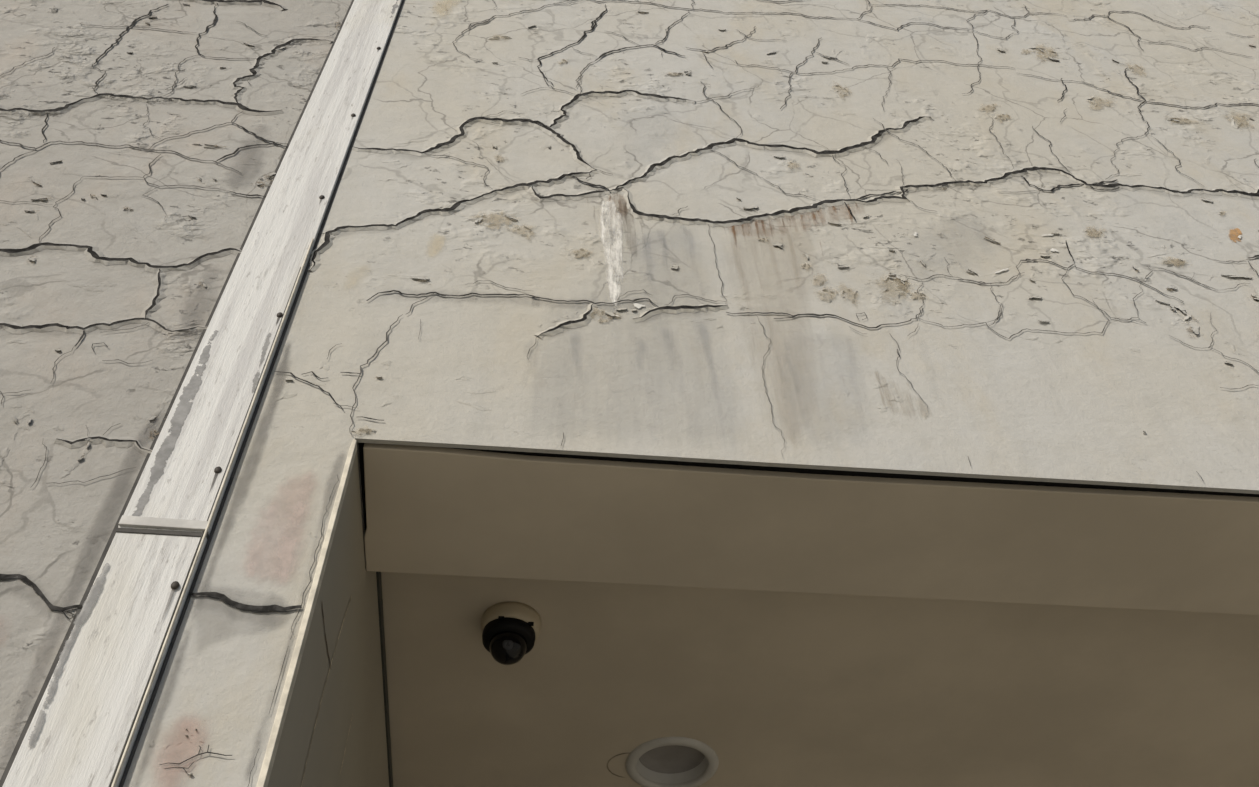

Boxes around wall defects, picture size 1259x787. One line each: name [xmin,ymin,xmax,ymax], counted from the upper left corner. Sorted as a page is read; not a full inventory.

crack [0,0,332,219]
crack [0,176,242,404]
water stain [600,200,623,306]
crack [274,0,1259,456]
peeling [758,225,954,319]
peeling [1155,287,1204,337]
crack [30,423,152,488]
crack [0,574,83,620]
crack [189,592,331,668]